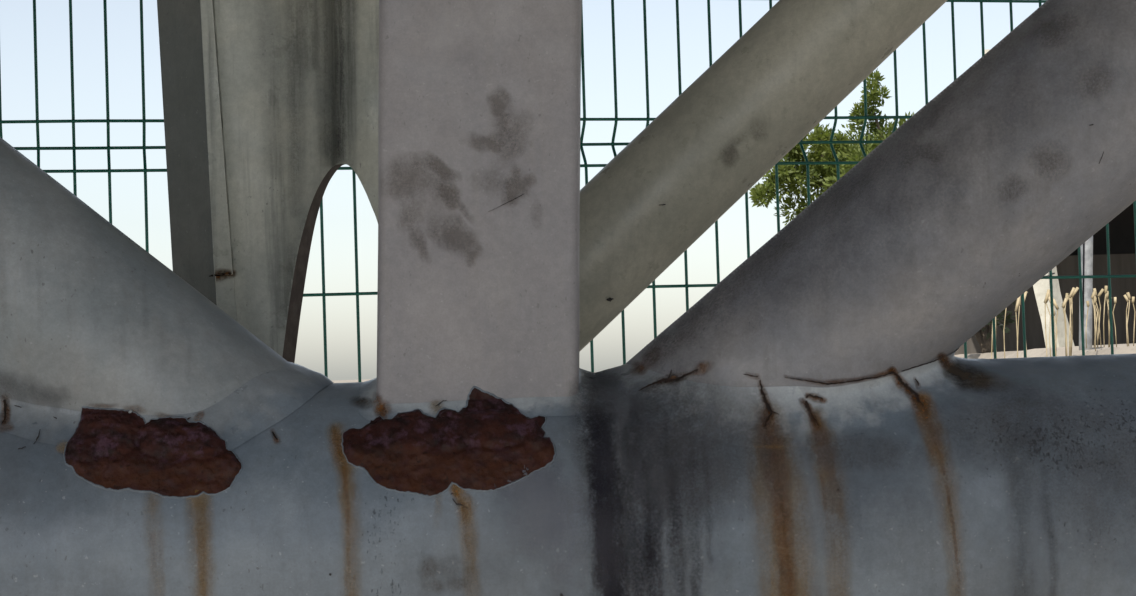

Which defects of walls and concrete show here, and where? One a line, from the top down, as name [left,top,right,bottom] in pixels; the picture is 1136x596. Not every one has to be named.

crack [639,363,707,391]
crack [744,356,945,428]
damp [588,376,679,596]